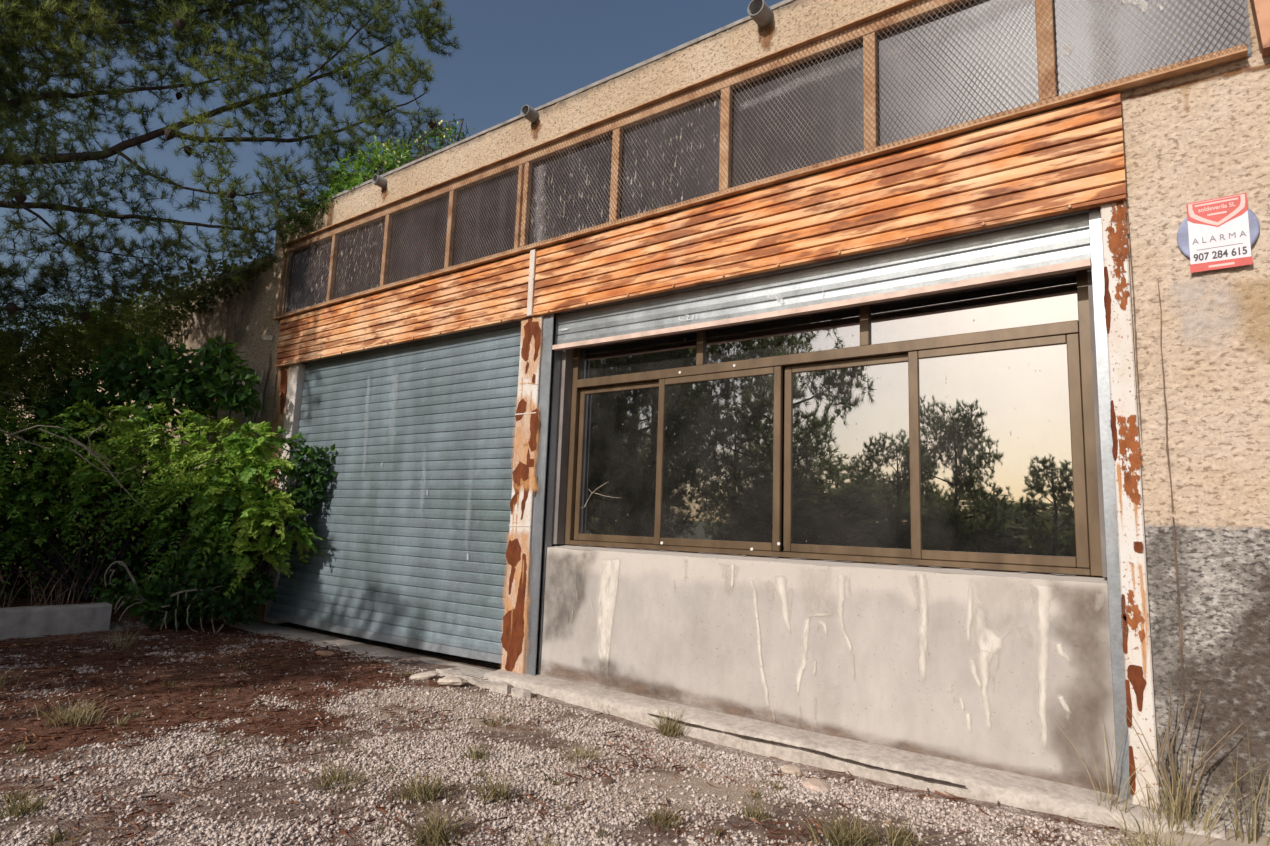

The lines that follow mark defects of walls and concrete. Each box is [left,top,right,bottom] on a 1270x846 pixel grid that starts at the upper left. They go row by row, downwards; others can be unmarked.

rust [1104,201,1131,334]
rust [501,316,541,672]
rust [1110,400,1142,512]
water stain [751,571,854,720]
water stain [916,573,928,678]
rust [1121,541,1147,727]
water stain [1157,574,1270,803]